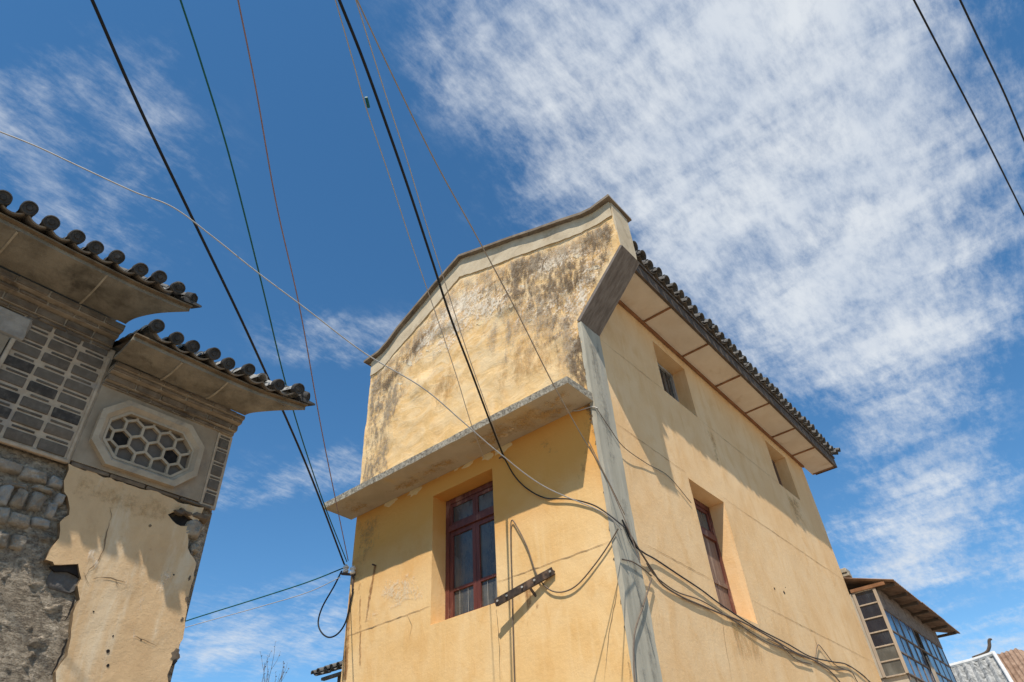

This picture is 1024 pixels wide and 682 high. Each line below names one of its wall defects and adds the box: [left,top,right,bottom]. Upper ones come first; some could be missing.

damp [362,223,612,483]
flaking render [0,446,79,614]
crack [51,510,124,675]
spalling [170,648,180,666]
spalling [168,507,211,555]